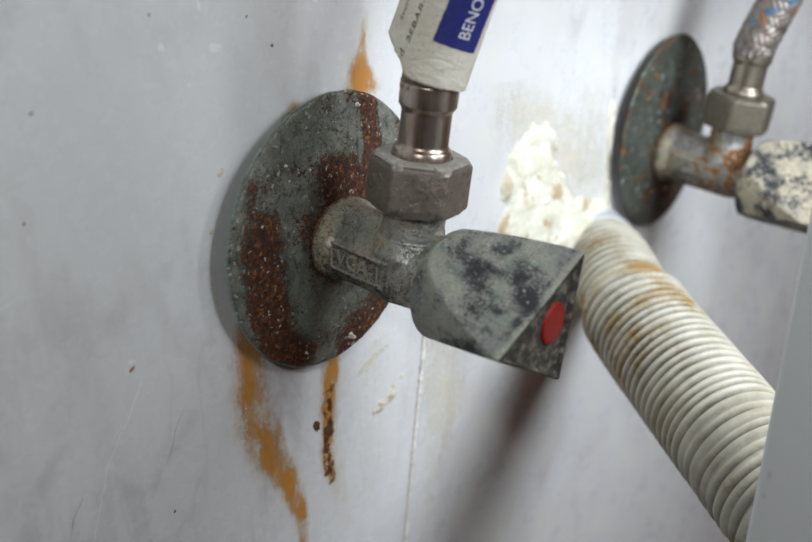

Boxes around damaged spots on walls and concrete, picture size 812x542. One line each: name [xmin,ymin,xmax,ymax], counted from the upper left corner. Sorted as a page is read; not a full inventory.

corrosion [348,33,375,93]
corrosion [238,327,307,542]
corrosion [313,356,338,485]